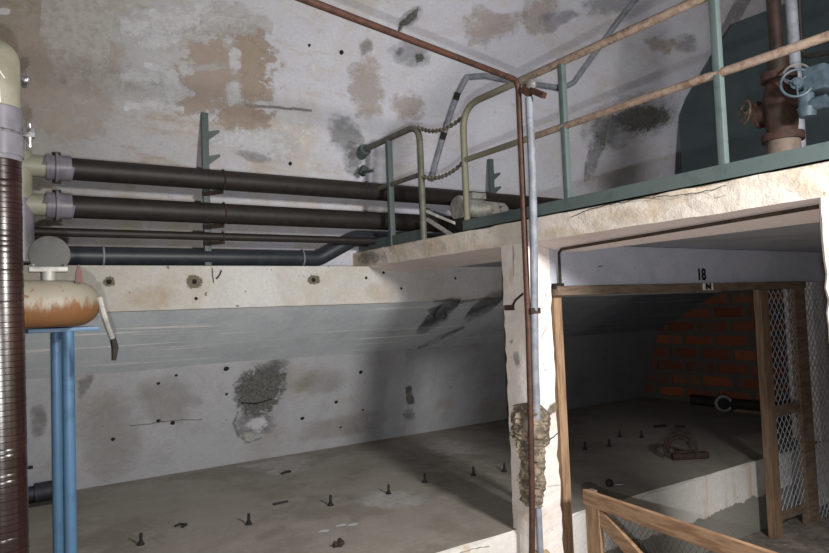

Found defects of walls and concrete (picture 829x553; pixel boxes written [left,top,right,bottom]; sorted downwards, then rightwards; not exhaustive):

peeling [174,24,282,132]
leakage [611,106,670,132]
crack [571,185,726,217]
spalling [510,402,558,508]
peeling [690,493,768,539]
peeling [632,533,710,553]